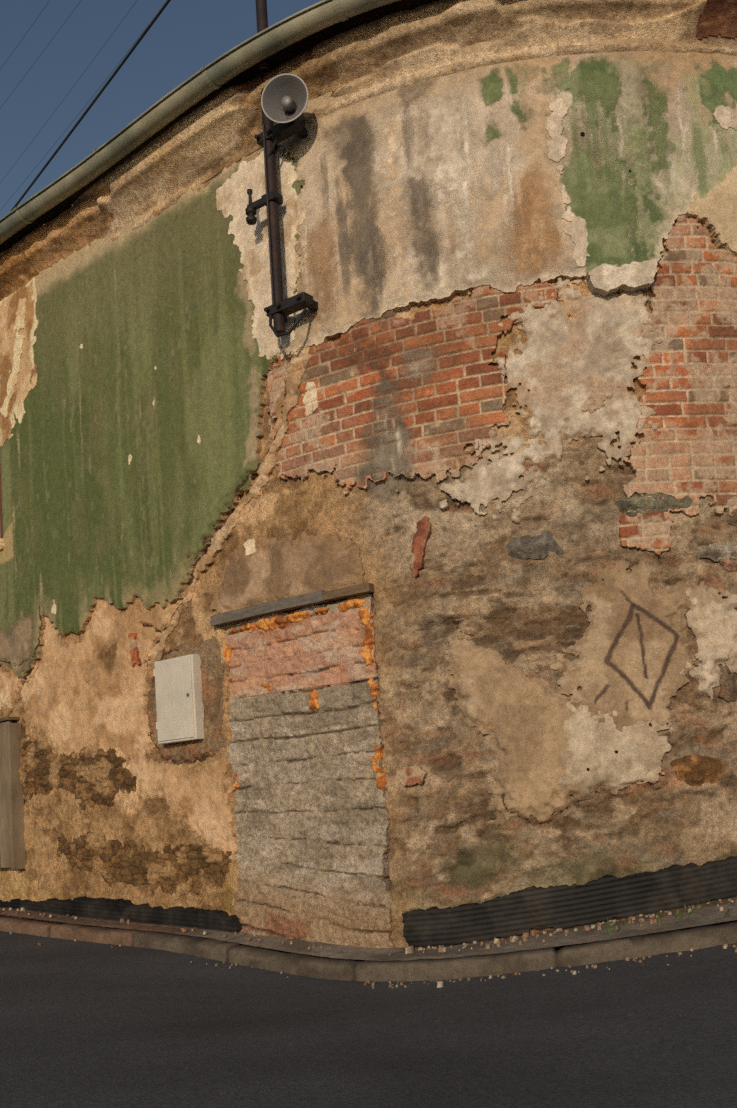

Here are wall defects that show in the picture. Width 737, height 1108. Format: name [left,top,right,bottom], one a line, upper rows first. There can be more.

flaking render [696,0,737,39]
damp [599,112,629,185]
damp [676,87,693,174]
damp [321,81,514,318]
peeling [0,250,39,446]
flaking render [200,48,559,496]
flaking render [543,57,737,556]
flaking render [409,516,432,577]
flaking render [128,633,142,666]
spalling [144,636,234,765]
spalling [19,726,136,810]
spalling [56,831,232,903]